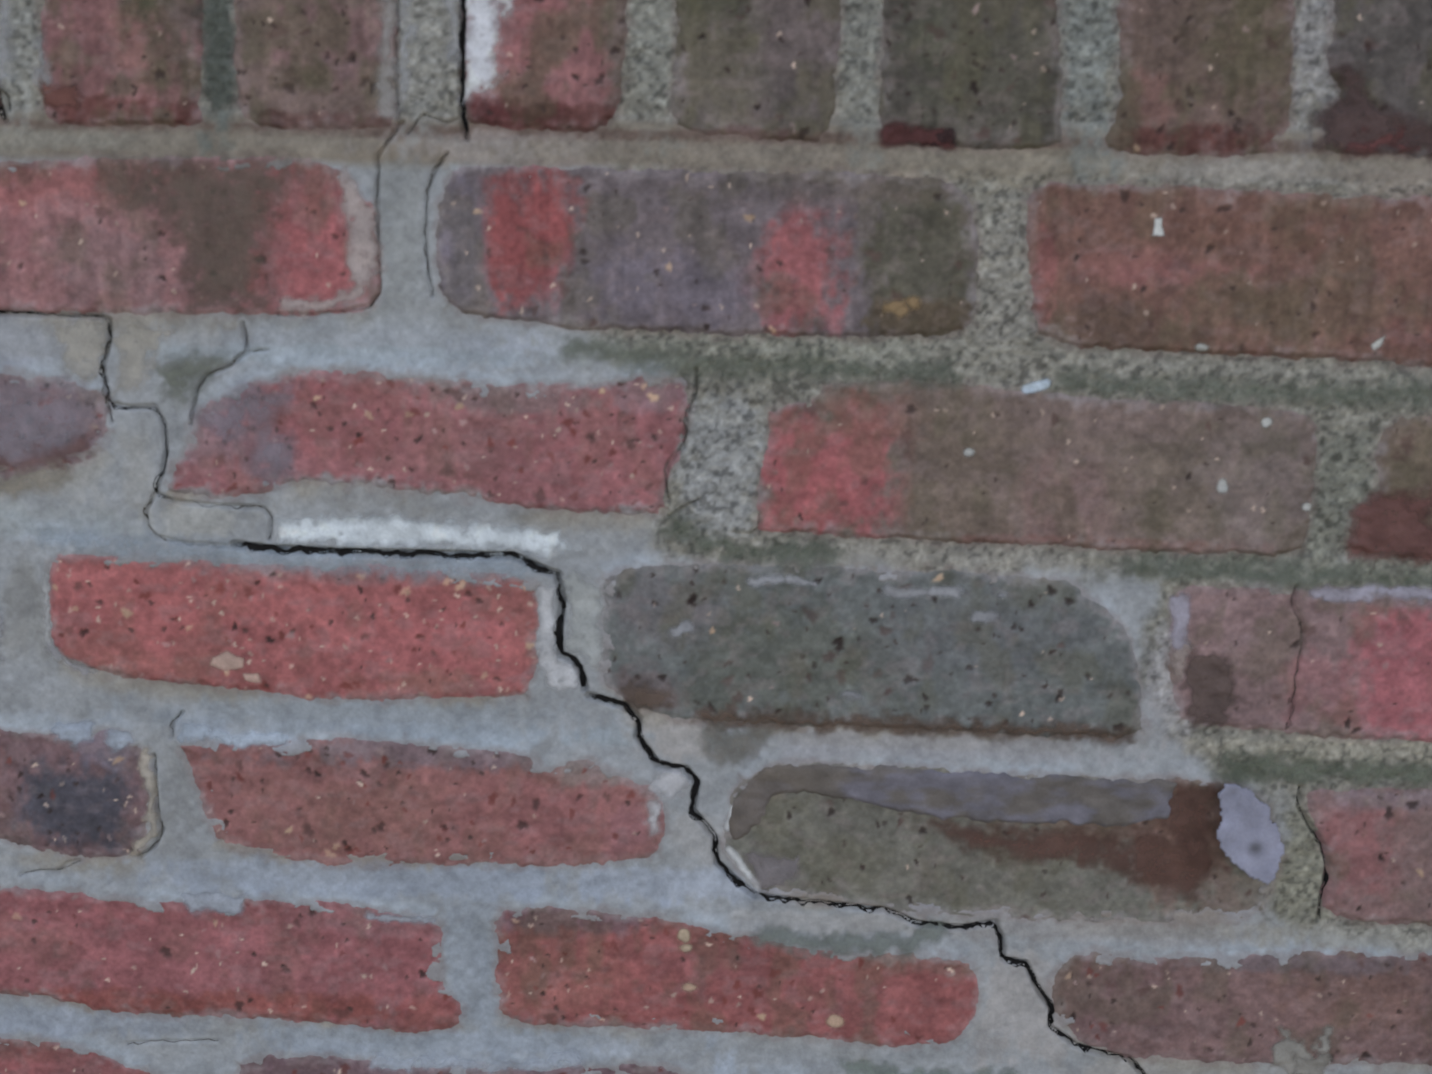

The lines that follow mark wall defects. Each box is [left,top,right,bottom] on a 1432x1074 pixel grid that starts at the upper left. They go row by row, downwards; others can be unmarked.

crack [279,0,469,316]
crack [0,310,1146,1074]
crack [1286,586,1302,729]
peeling [729,764,1177,840]
peeling [1217,783,1284,885]
crack [1296,786,1329,918]